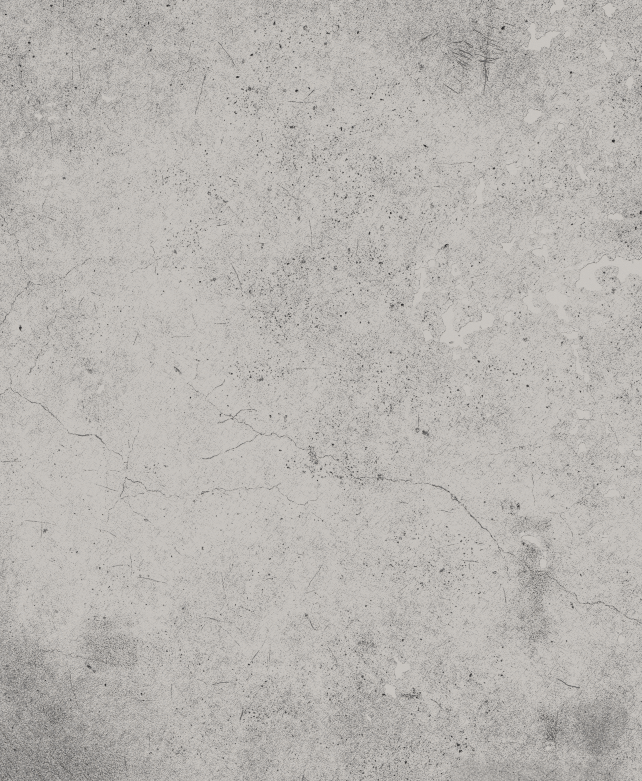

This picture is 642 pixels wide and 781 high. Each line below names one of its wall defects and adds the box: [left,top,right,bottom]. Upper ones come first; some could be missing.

peeling [435,301,500,362]
crack [4,379,315,523]
crack [188,369,640,624]